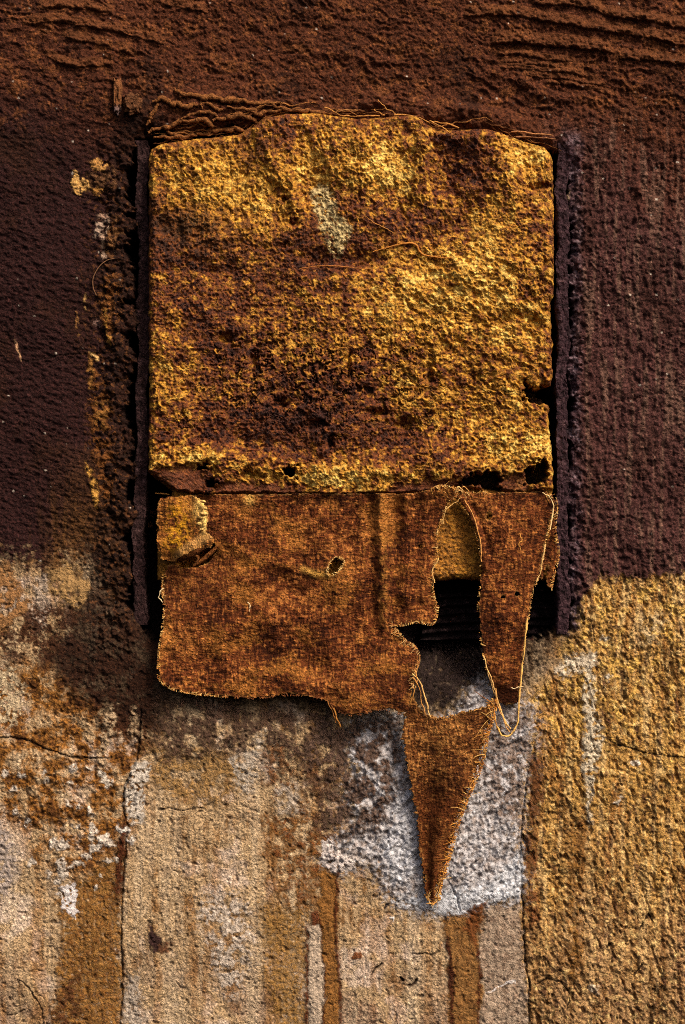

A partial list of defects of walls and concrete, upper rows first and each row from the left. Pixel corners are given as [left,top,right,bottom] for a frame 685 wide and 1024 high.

crack [119,710,142,1020]
flaking render [321,672,536,1024]